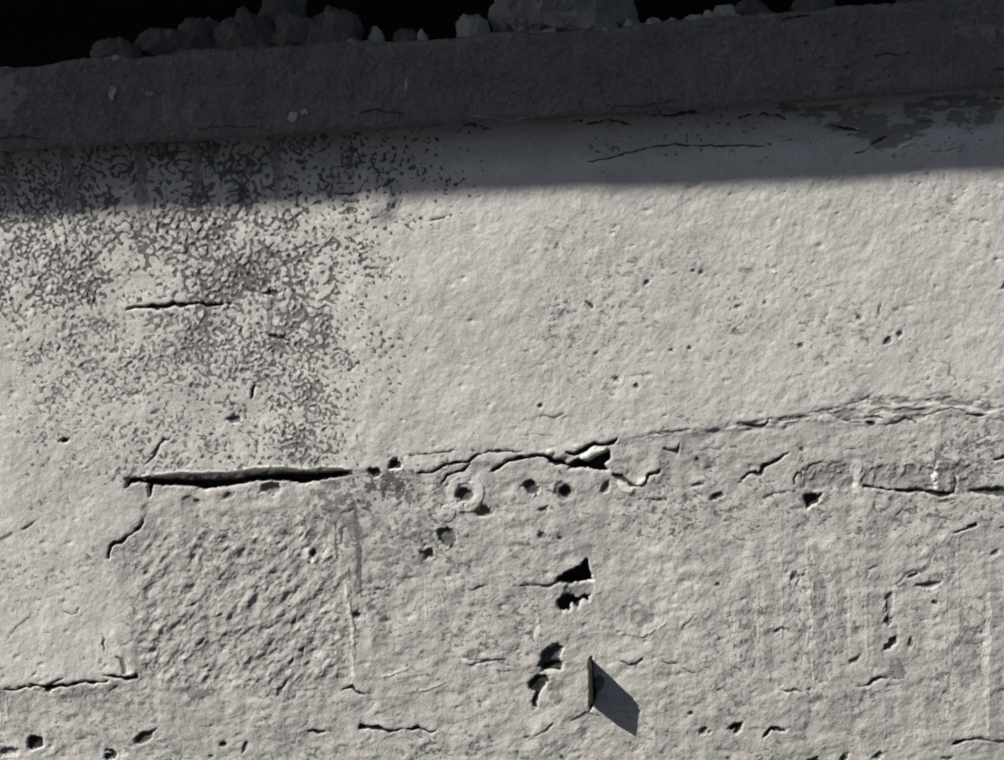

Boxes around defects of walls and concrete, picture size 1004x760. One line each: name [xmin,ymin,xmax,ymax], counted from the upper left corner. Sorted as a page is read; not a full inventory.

crack [86,520,144,559]
crack [409,412,617,507]
crack [613,397,989,527]
crack [863,475,1004,533]
crack [6,634,138,702]
spalling [564,581,594,596]
spalling [593,675,605,691]
leakage [732,540,785,682]
leakage [799,538,852,689]
leakage [863,565,906,739]
leakage [951,536,1004,737]
crack [308,724,434,754]